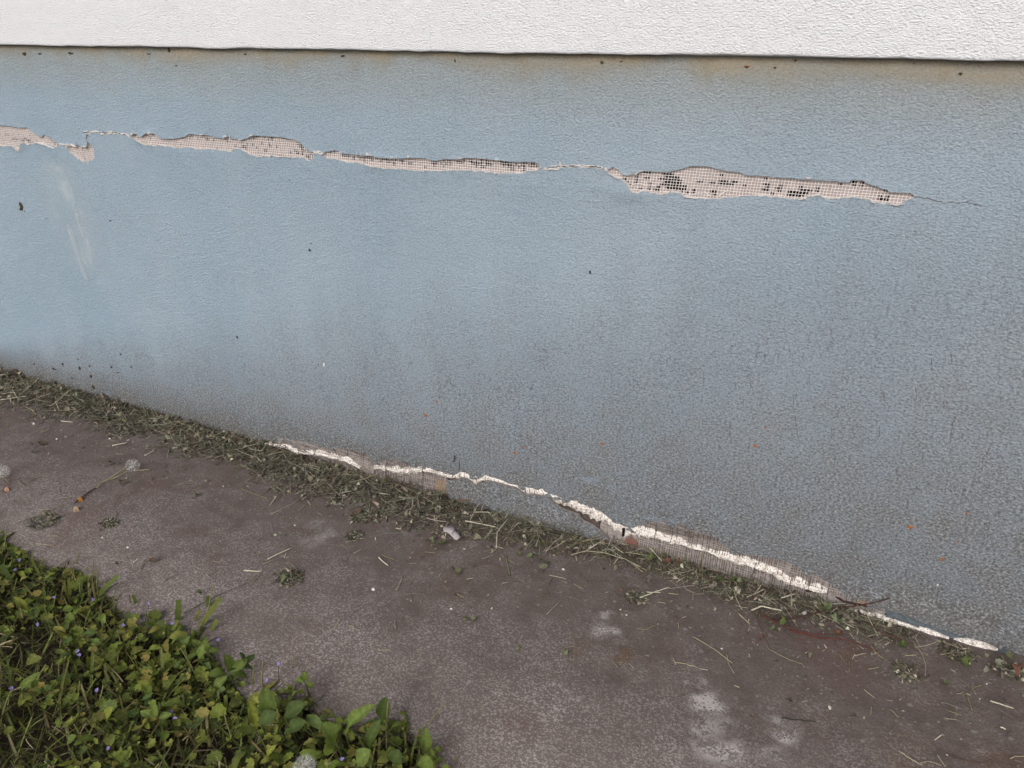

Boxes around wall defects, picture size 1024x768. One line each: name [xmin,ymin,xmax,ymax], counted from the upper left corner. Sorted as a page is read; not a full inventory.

peeling [0,126,94,164]
peeling [131,132,541,175]
peeling [608,166,914,206]
spalling [260,438,966,639]